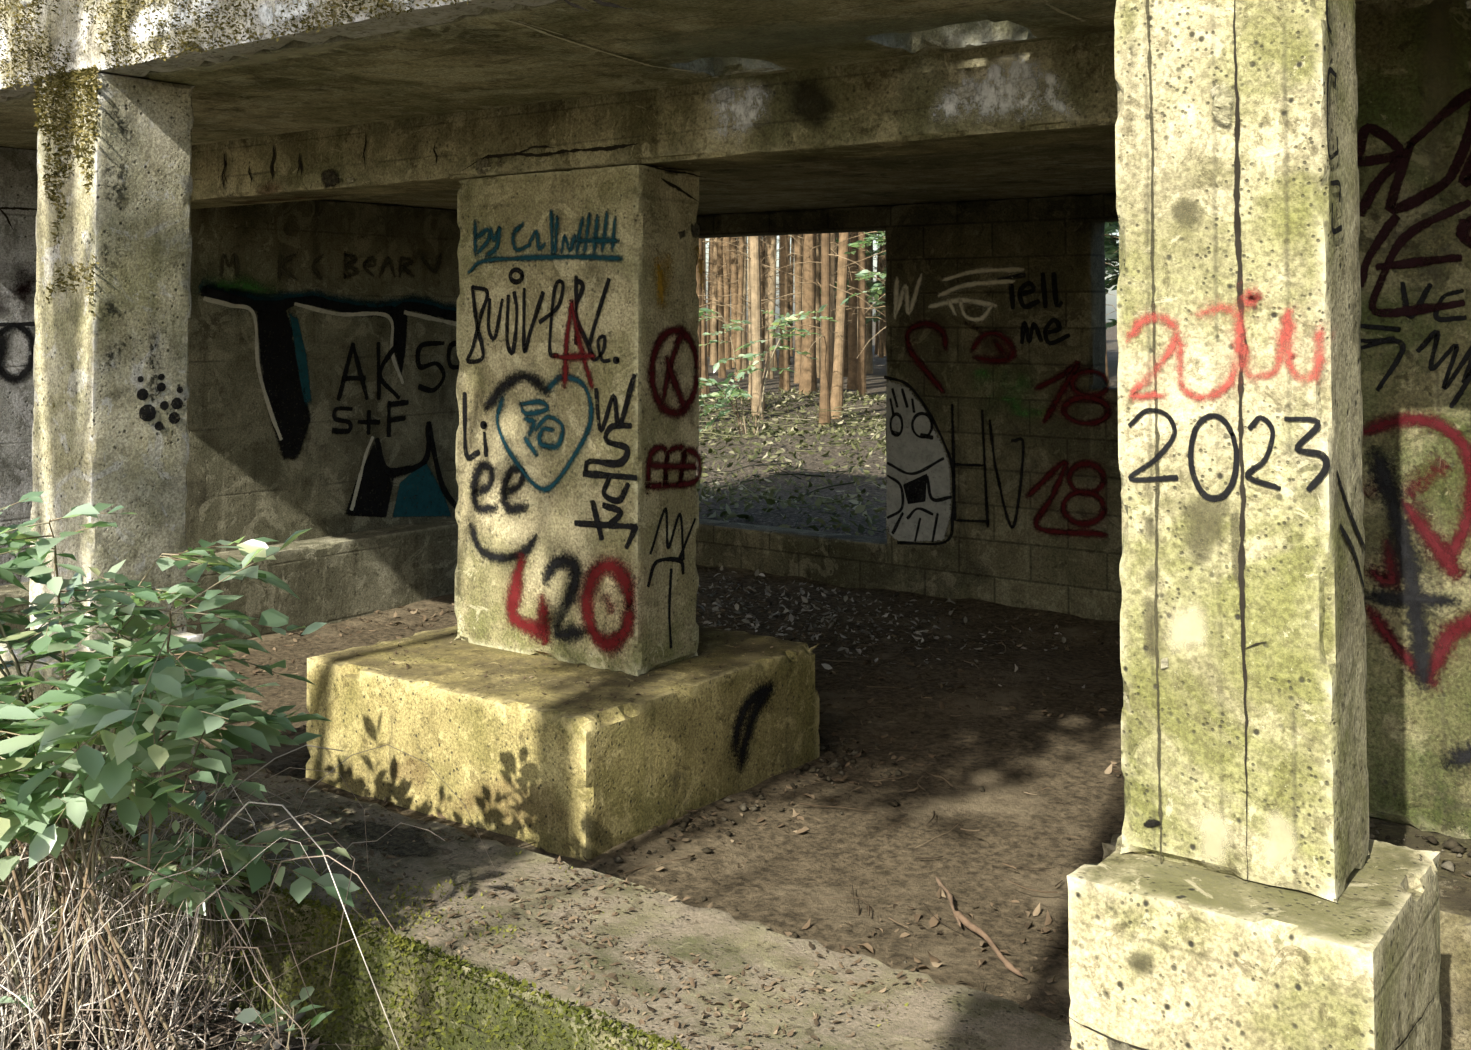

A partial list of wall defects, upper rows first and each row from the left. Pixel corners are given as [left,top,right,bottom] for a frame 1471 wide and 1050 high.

crack [433,143,706,202]
crack [1233,0,1267,881]
crack [1061,1013,1149,1050]
crack [1395,997,1434,1050]